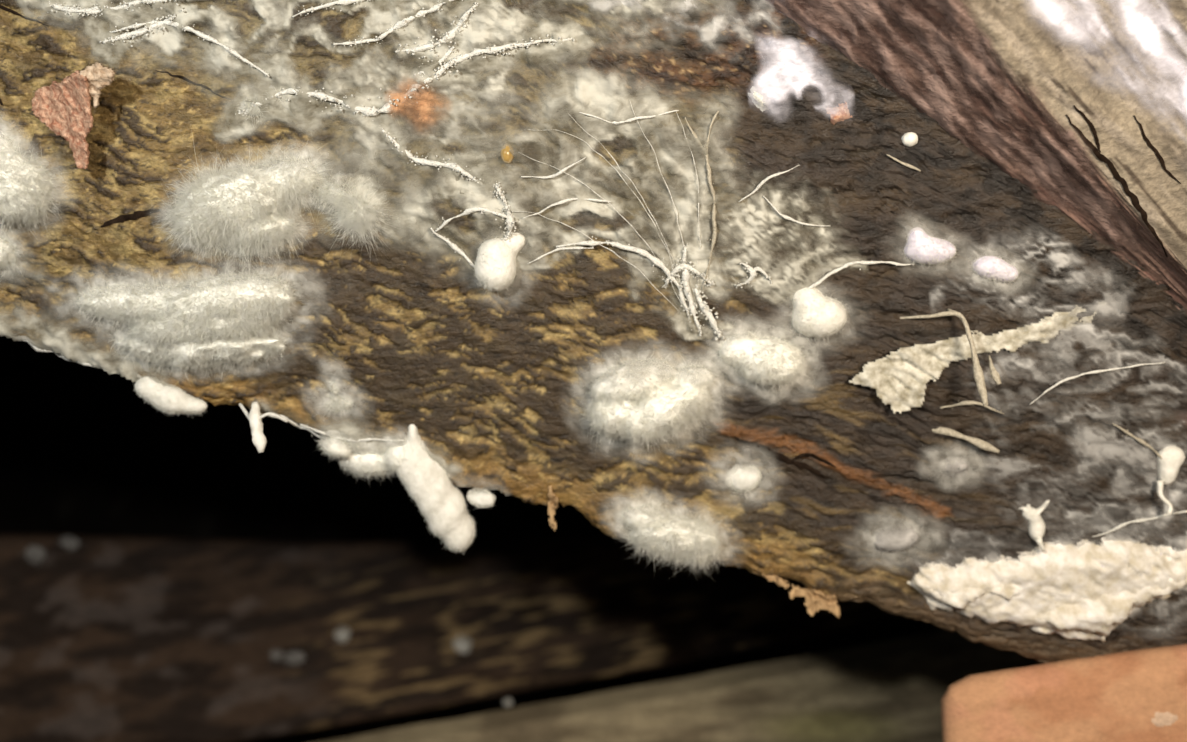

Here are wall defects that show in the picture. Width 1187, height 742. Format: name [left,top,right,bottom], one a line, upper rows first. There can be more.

crack [0,5,48,26]
peeling [32,62,116,169]
damp [0,0,959,454]
damp [578,0,1136,251]
crack [1066,105,1167,257]
damp [1117,0,1187,115]
crack [1134,115,1181,184]
damp [971,237,1184,405]
damp [260,375,496,554]
damp [607,494,730,582]
damp [725,462,765,514]
damp [867,405,1187,643]